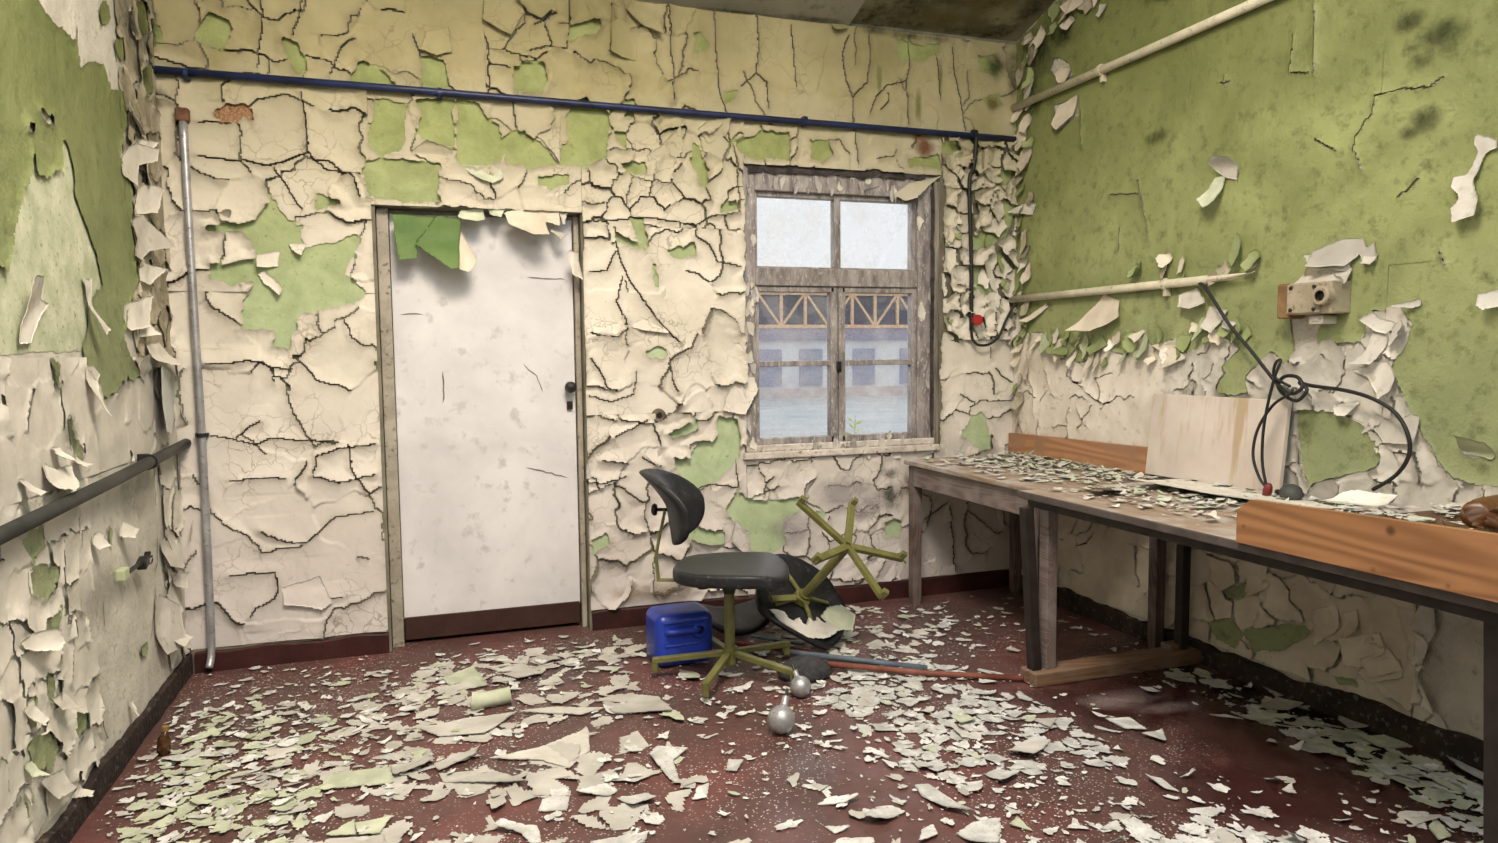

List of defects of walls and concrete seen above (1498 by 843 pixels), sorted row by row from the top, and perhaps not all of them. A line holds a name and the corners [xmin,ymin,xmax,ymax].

crack [198,94,360,208]
crack [258,0,303,65]
crack [842,37,963,123]
crack [1315,77,1443,164]
crack [584,19,796,483]
crack [208,360,290,380]
peeling [0,0,1498,669]
crack [960,374,1111,426]
crack [212,422,375,618]
crack [698,459,770,503]
peeling [0,501,140,843]
peeling [1057,514,1446,730]